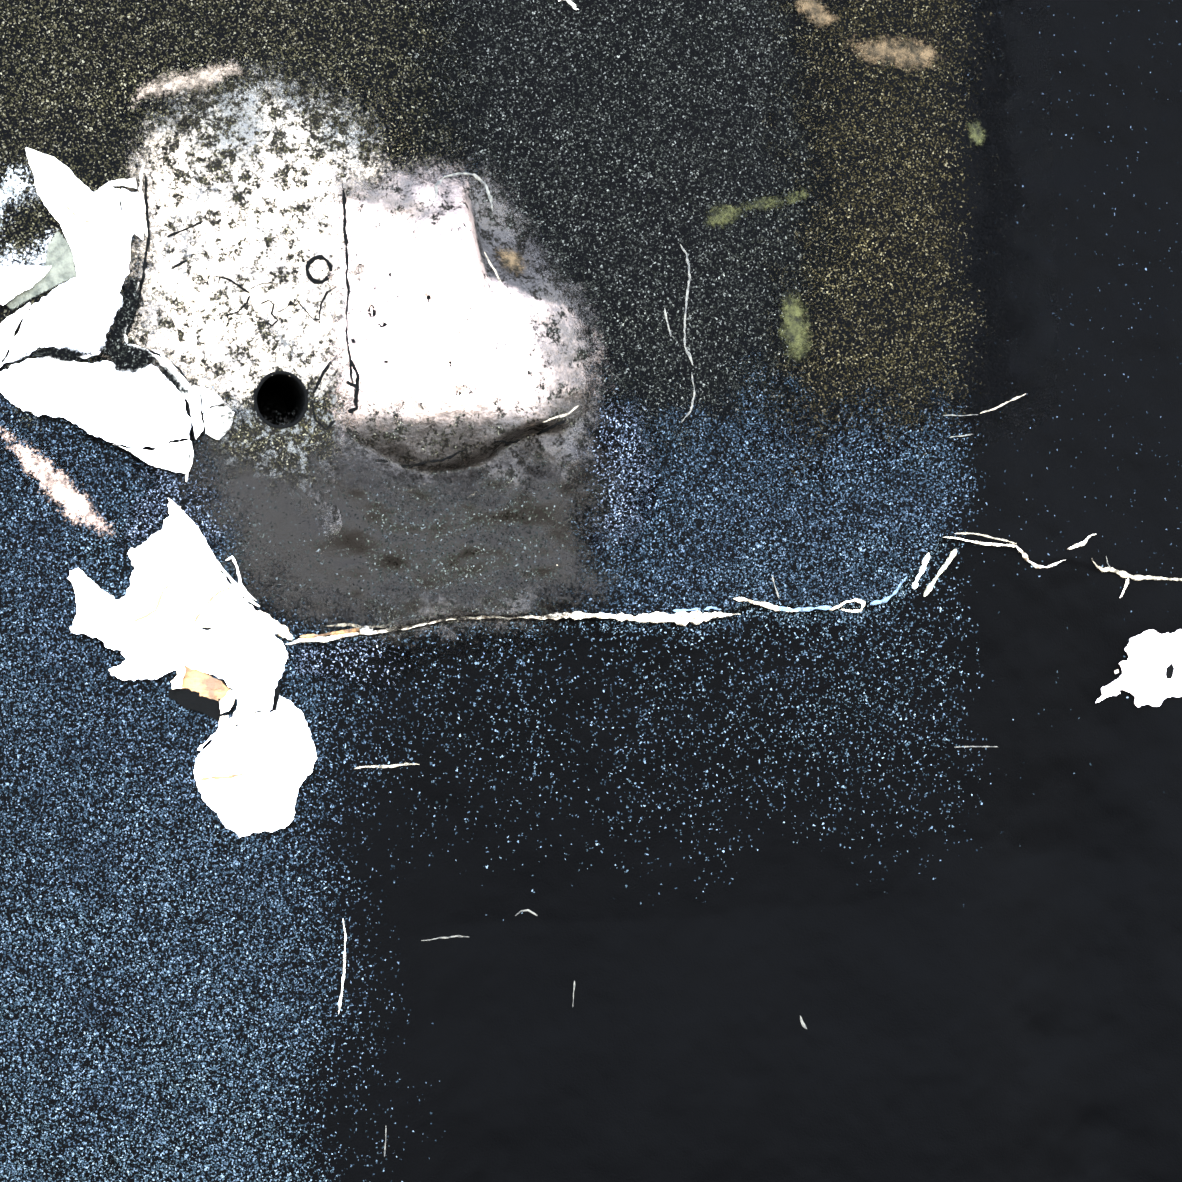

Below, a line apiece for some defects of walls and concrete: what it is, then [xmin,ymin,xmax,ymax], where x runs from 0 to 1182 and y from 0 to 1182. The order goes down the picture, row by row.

spalling [0,65,386,488]
crack [218,183,361,430]
leakage [121,461,243,545]
crack [943,532,1182,598]
crack [288,575,907,645]
peeling [67,498,317,838]
peeling [1095,629,1182,707]